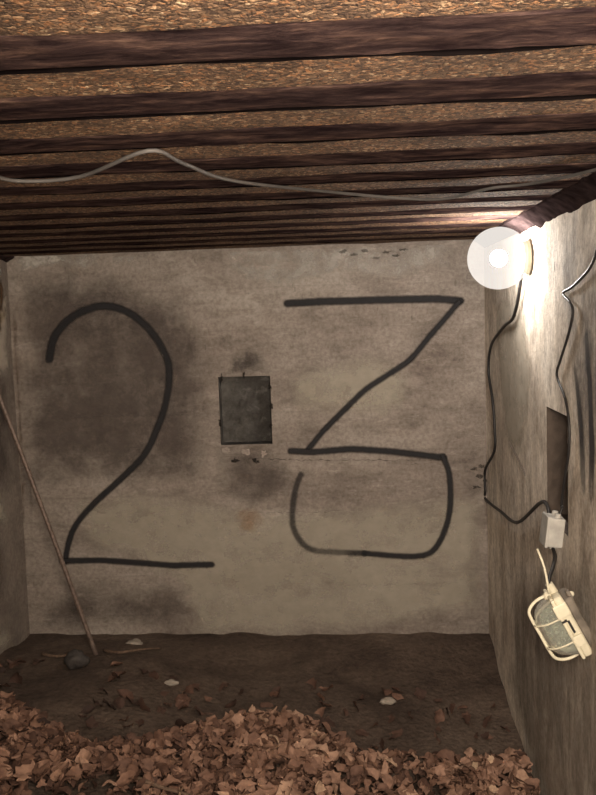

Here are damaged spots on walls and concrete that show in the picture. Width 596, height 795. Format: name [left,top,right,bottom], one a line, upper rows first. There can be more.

water stain [575,314,596,485]